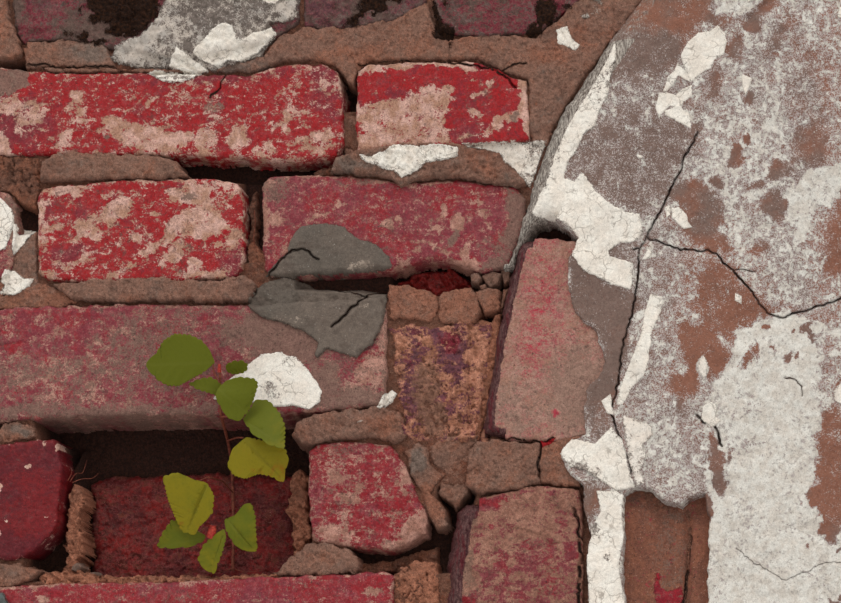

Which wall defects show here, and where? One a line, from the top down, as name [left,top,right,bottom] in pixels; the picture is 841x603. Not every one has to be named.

peeling [556,26,579,50]
peeling [148,23,277,83]
peeling [656,25,727,128]
peeling [742,74,752,95]
peeling [532,44,643,289]
peeling [664,205,692,229]
crack [611,133,841,473]
peeling [698,356,708,379]
peeling [833,382,841,404]
peeling [700,402,721,427]
peeling [560,294,663,603]